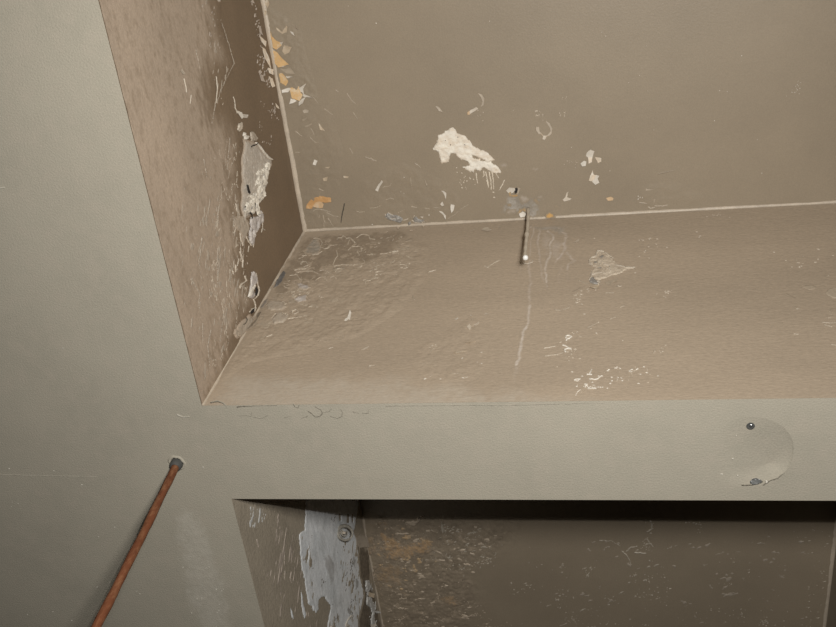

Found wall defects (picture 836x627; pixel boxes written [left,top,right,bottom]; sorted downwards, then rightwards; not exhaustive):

spalling [433,128,509,198]
peeling [564,150,601,185]
peeling [99,0,435,404]
spalling [554,250,636,314]
peeling [543,331,581,361]
peeling [571,366,659,396]
peeling [246,501,267,548]
peeling [267,499,533,627]